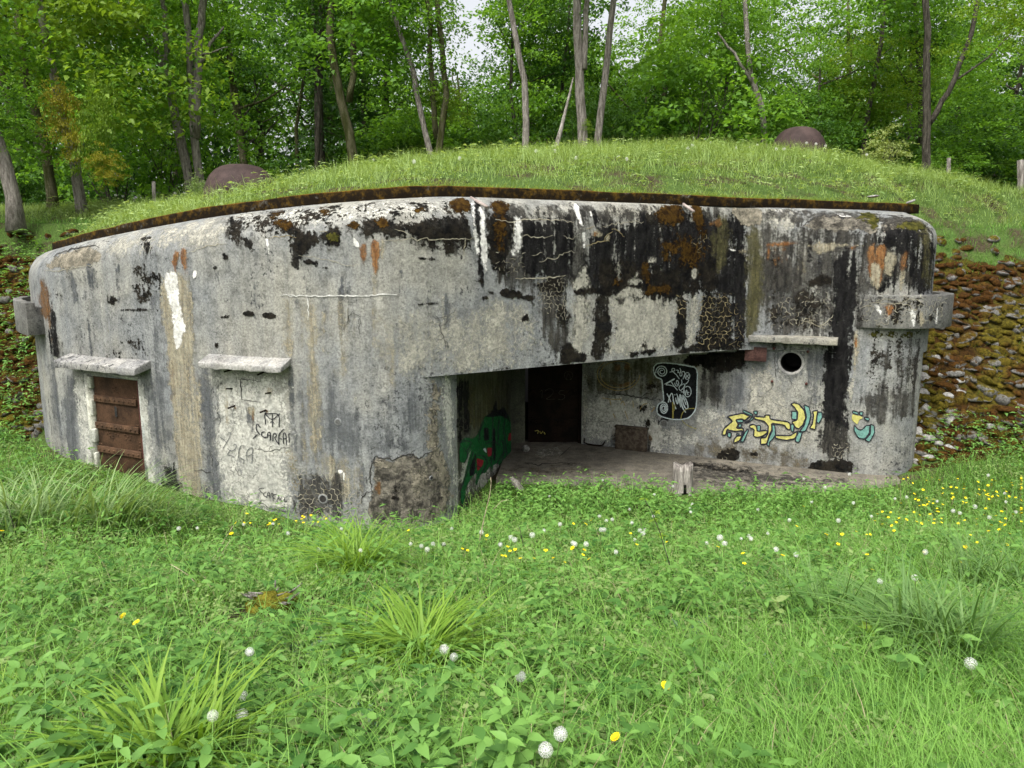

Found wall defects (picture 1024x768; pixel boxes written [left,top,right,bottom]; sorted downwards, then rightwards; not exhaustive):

corrosion [172,248,187,272]
corrosion [360,240,380,274]
crack [384,218,643,320]
corrosion [843,244,907,289]
crack [284,293,397,333]
crack [676,293,744,349]
damp [106,197,949,522]
spalling [368,375,459,527]